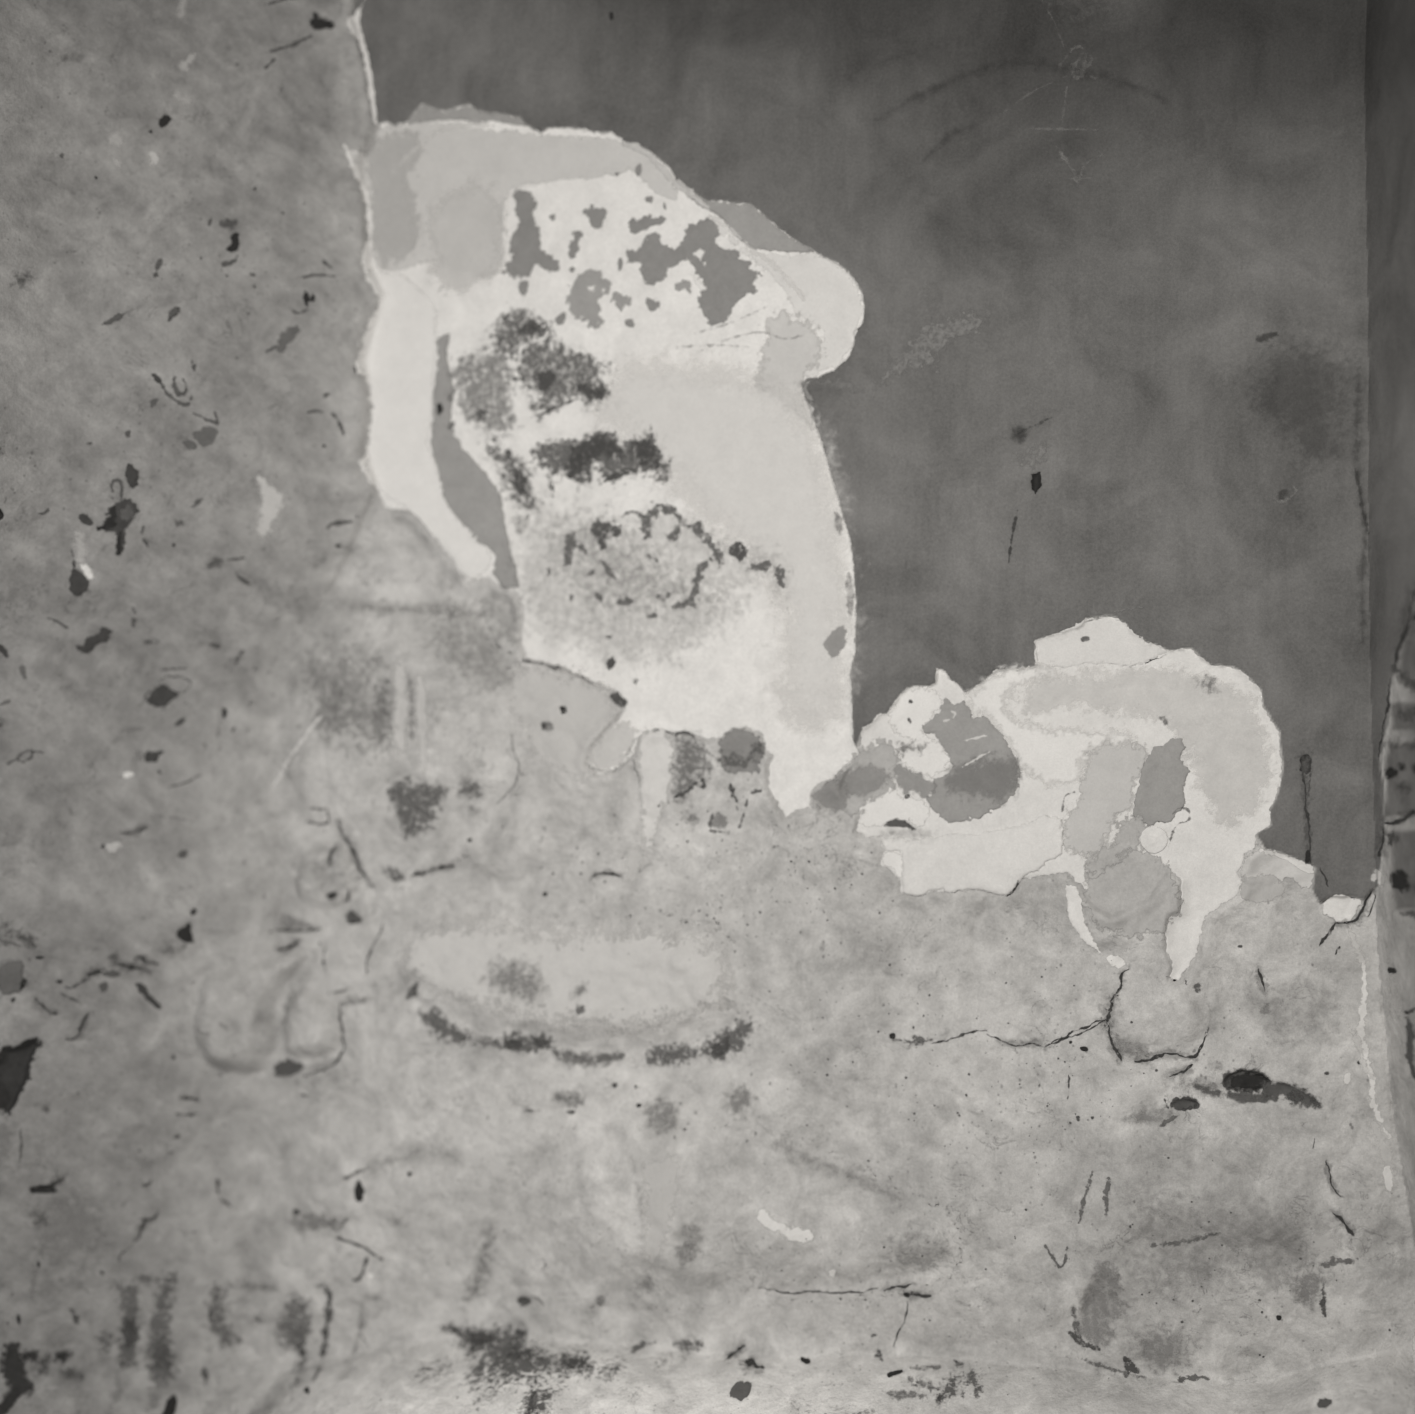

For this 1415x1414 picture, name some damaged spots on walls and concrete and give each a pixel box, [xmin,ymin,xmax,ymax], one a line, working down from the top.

flaking render [343,1,1314,980]
flaking render [1319,891,1376,955]
crack [1238,945,1267,1013]
crack [889,969,1207,1099]
spalling [1317,1398,1332,1408]